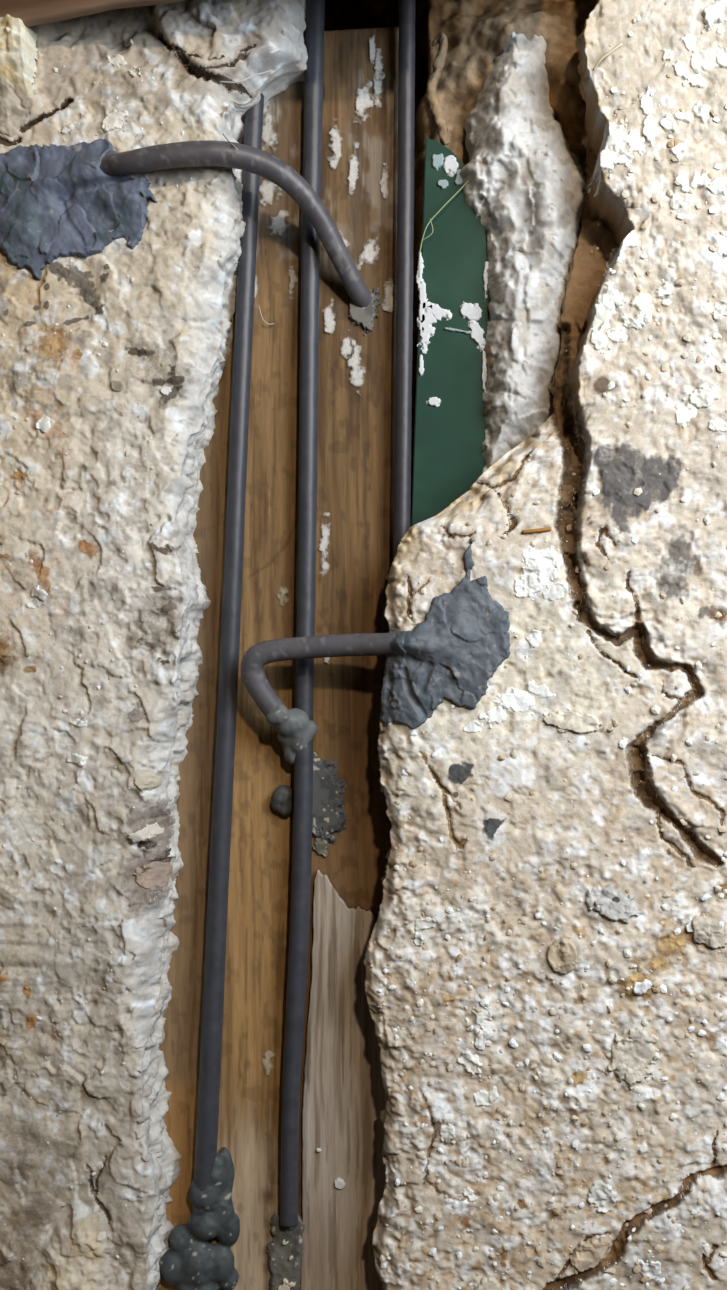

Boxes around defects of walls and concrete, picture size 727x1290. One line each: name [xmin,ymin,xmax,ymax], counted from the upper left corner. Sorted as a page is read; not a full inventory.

peeling [356,36,385,120]
peeling [260,181,289,236]
peeling [329,129,359,194]
peeling [432,153,463,189]
spalling [126,347,185,403]
peeling [324,299,366,386]
peeling [427,397,441,407]
peeling [416,252,489,396]
damp [594,444,682,532]
peeling [319,513,330,574]
crack [440,324,726,868]
crack [543,1129,727,1290]